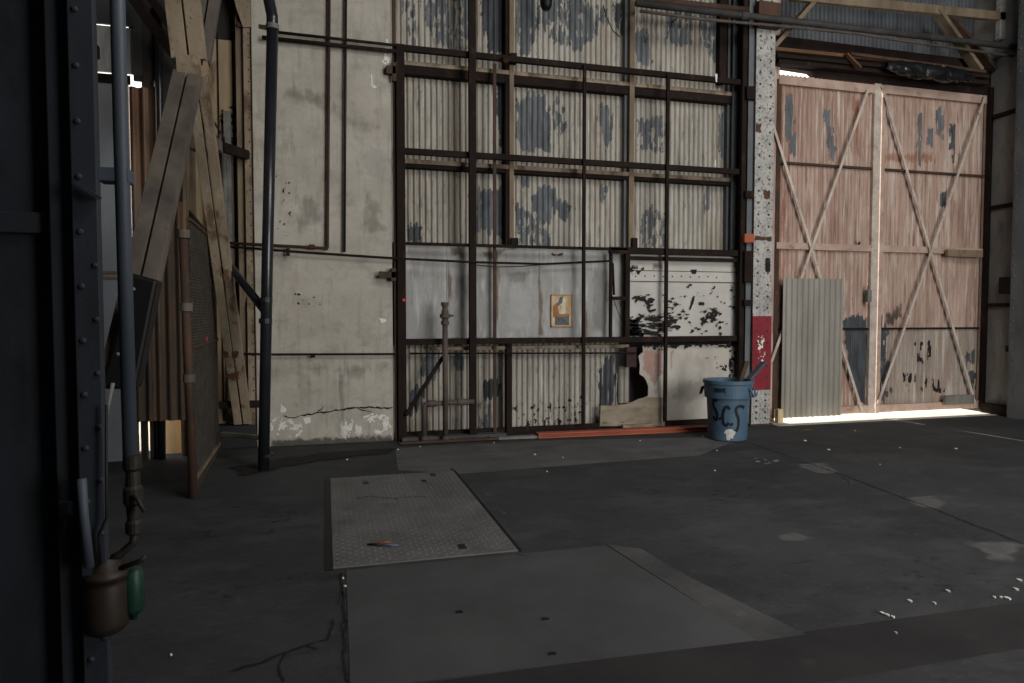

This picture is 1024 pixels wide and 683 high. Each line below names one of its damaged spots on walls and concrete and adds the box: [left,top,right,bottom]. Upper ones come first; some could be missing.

peeling [630,269,737,350]
peeling [270,404,311,437]
crack [284,406,393,418]
peeling [338,413,392,442]